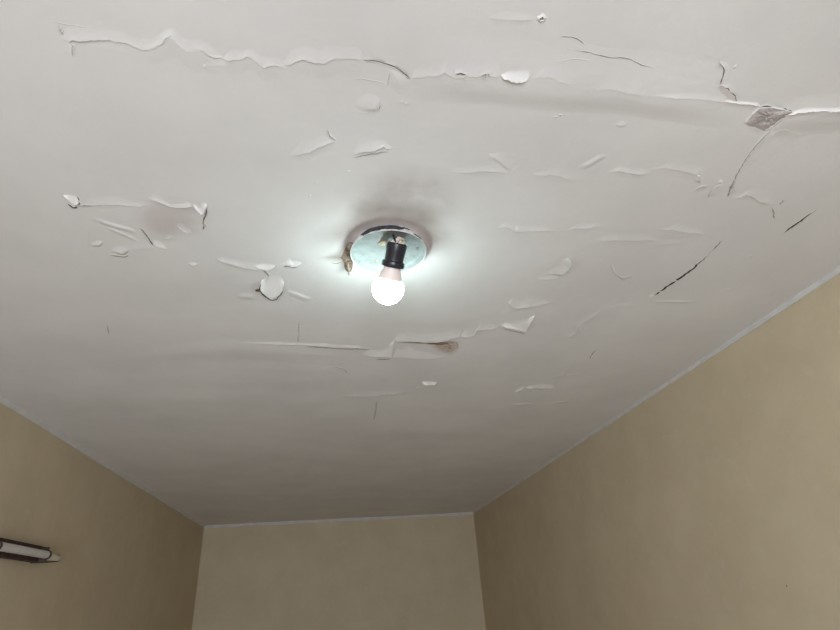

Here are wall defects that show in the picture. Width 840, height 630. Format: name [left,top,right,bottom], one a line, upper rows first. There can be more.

peeling [410,55,573,97]
crack [713,59,742,101]
spalling [723,99,840,143]
peeling [351,137,394,158]
crack [725,127,781,197]
peeling [64,194,210,233]
crack [782,207,820,234]
peeling [215,256,312,302]
crack [649,239,723,298]
peeling [236,315,546,360]